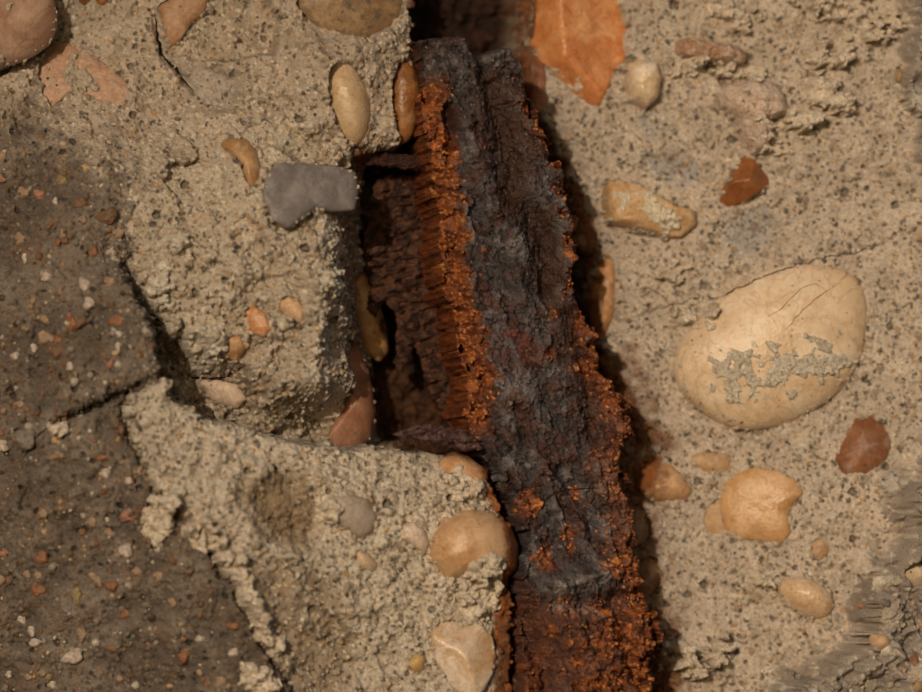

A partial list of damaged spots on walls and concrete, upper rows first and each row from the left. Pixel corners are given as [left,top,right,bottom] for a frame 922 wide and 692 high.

crack [23,372,158,458]
spalling [0,0,503,692]
rust [353,58,505,434]
rust [370,356,519,692]
rust [502,0,681,692]
crack [631,229,906,329]